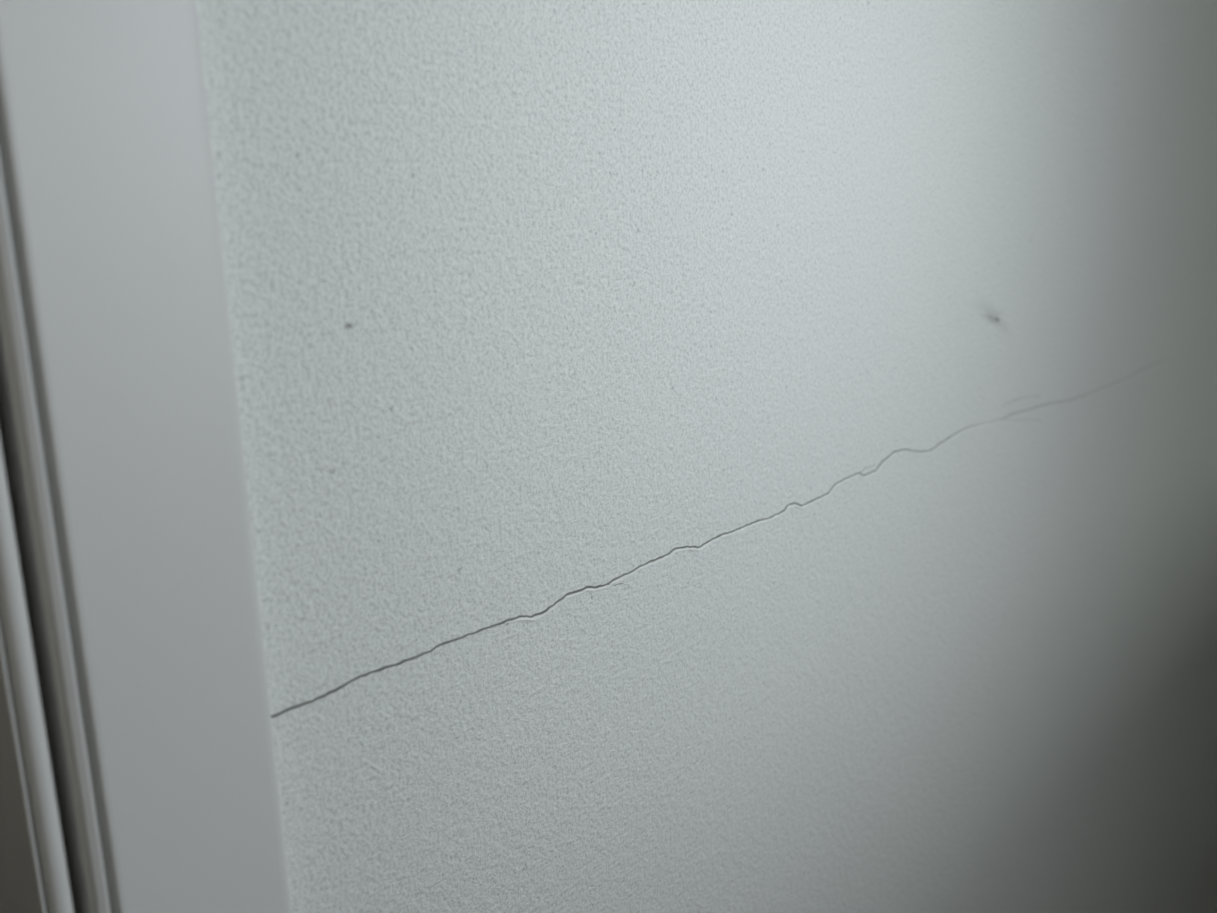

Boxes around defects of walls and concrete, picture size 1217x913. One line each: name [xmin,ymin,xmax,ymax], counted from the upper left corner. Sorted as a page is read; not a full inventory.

crack [271,361,1161,718]